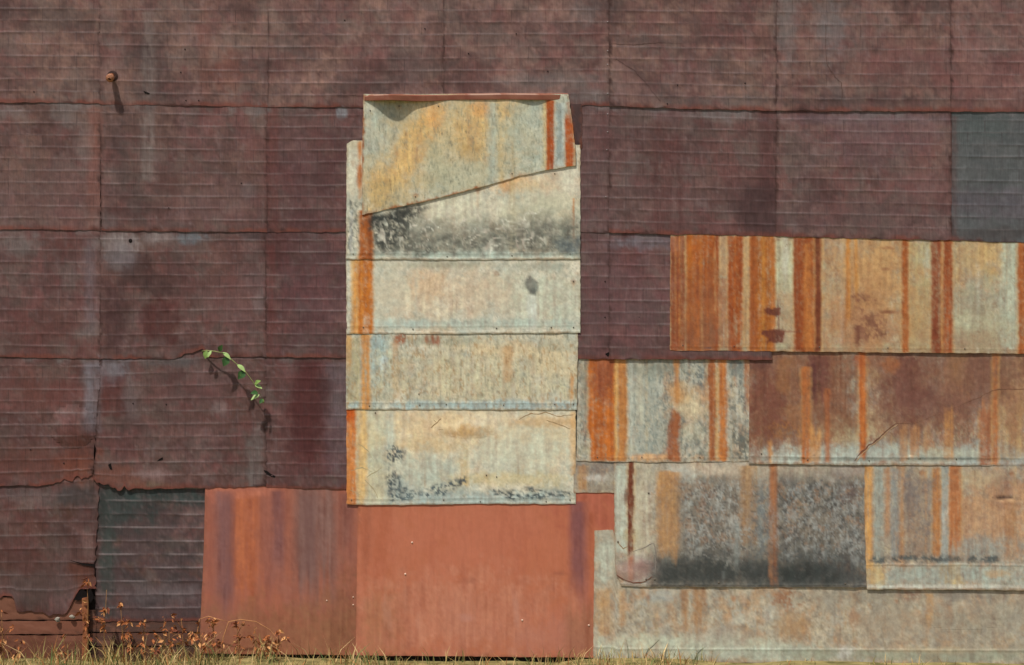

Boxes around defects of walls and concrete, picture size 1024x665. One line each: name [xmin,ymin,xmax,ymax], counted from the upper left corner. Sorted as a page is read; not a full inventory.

rust [542,100,576,171]
rust [346,215,378,505]
rust [391,333,409,374]
rust [423,334,442,348]
mould [384,440,469,505]
rust [568,359,643,587]
rust [654,234,1024,648]